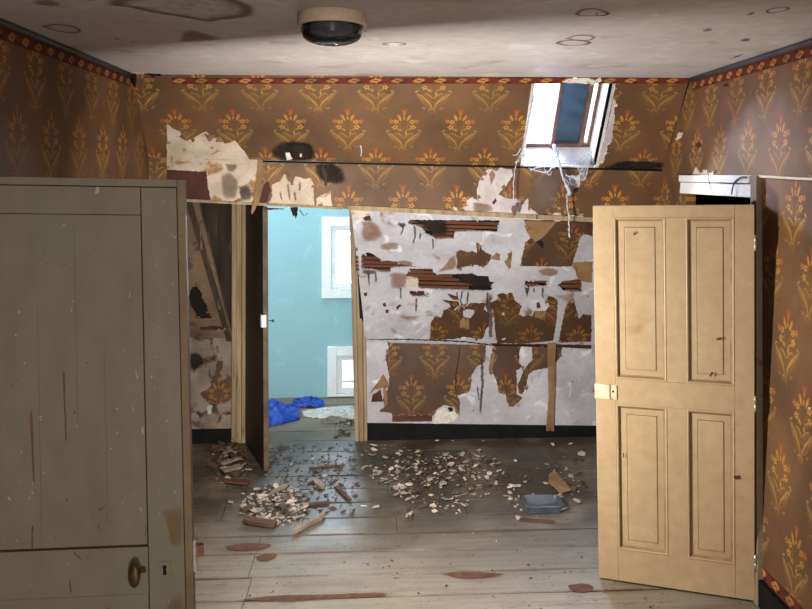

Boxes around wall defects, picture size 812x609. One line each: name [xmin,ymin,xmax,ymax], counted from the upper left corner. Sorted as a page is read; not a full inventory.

damp [112,0,251,21]
flaking render [167,170,210,200]
flaking render [351,208,372,221]
flaking render [408,219,499,238]
flaking render [356,248,509,313]
flaking render [525,280,548,288]
flaking render [558,265,582,303]
flaking render [189,286,229,333]
flaking render [392,407,458,424]